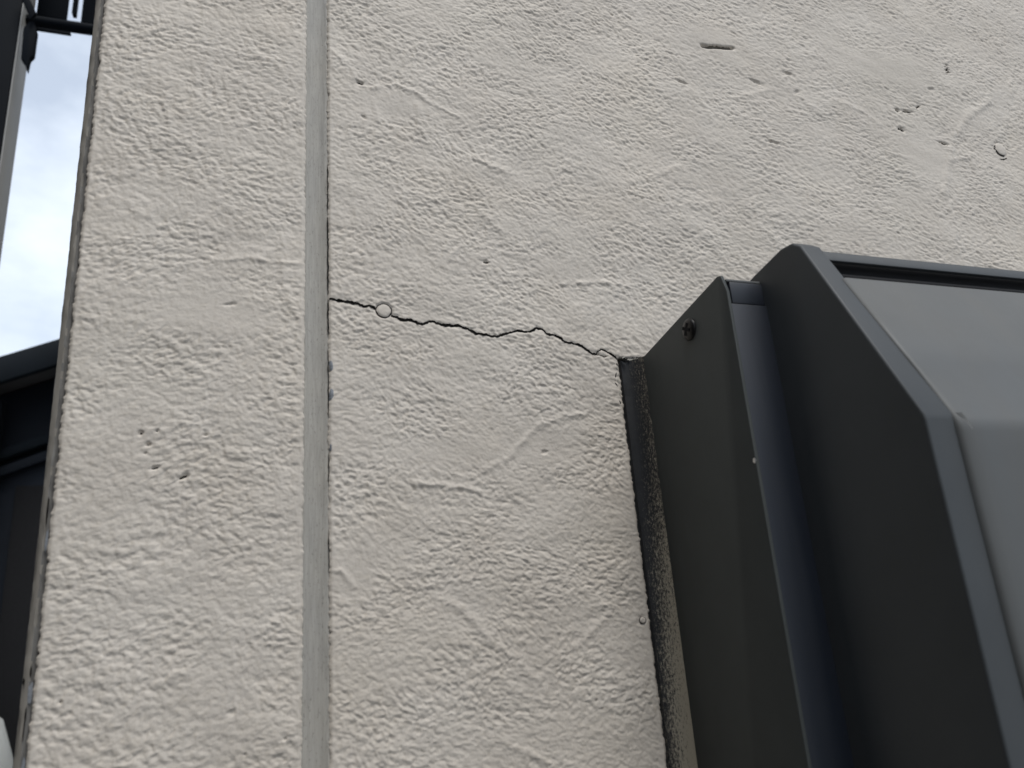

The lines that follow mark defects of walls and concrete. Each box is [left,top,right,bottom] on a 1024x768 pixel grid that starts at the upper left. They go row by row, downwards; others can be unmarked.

crack [327,165,617,412]